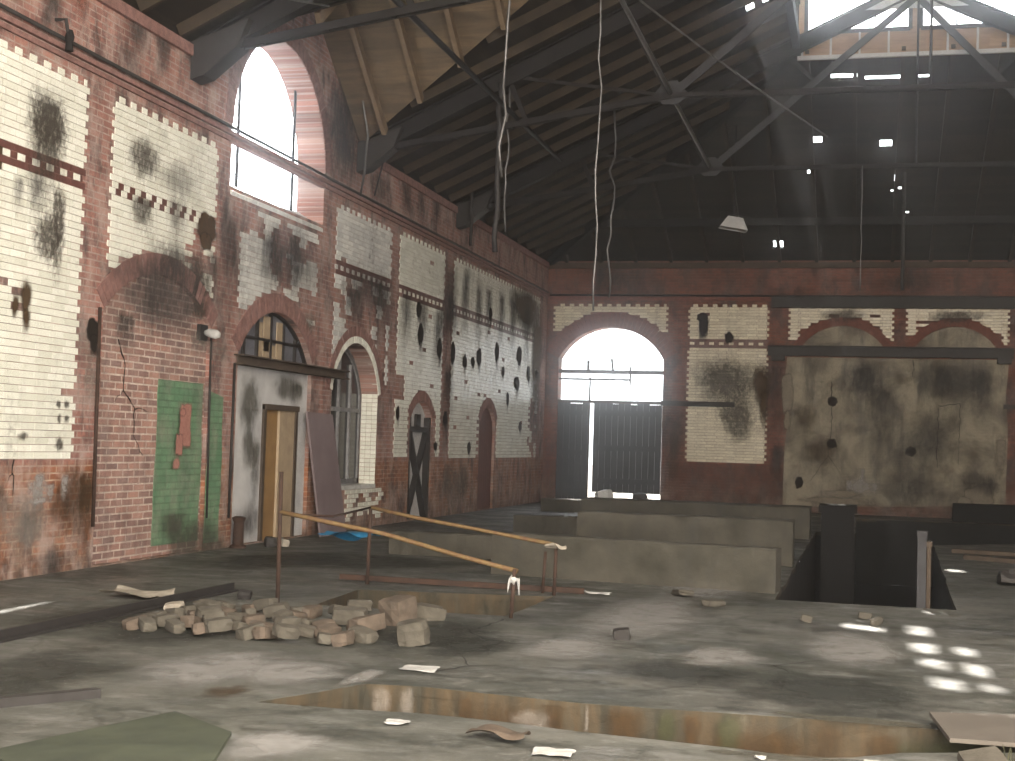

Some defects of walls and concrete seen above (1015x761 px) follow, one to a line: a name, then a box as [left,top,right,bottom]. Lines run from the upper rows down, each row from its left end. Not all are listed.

damp [53,193,65,262]
spalling [12,283,31,329]
damp [752,367,769,424]
peeling [173,404,192,469]
damp [242,384,259,475]